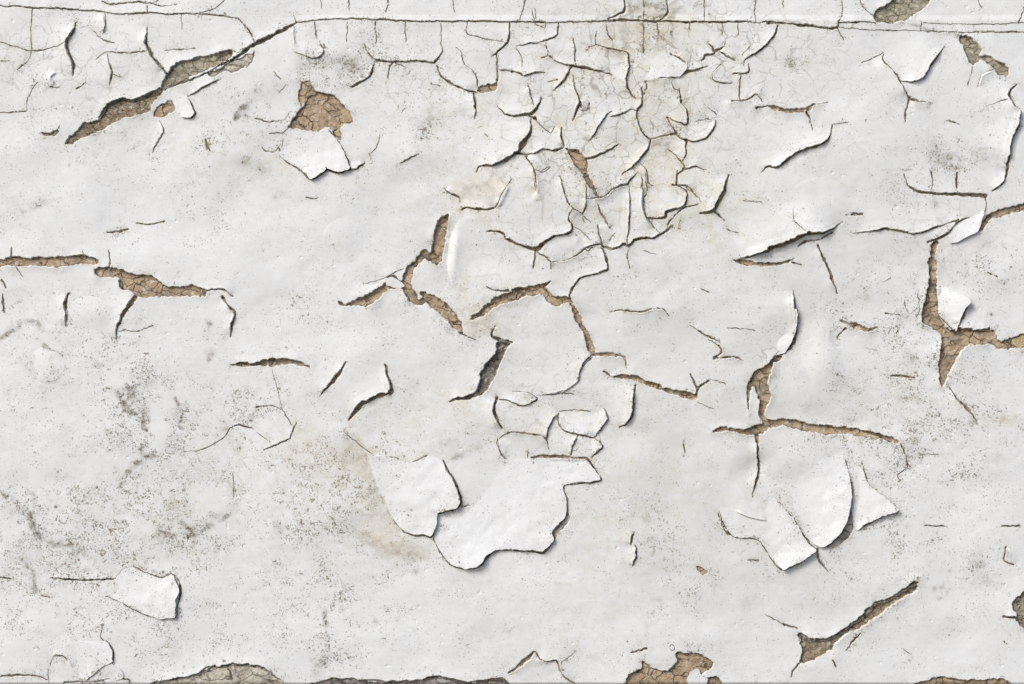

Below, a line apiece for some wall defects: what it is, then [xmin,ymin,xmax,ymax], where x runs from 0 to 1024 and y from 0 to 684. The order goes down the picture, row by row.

peeling [42,21,307,144]
peeling [279,81,353,181]
crack [293,0,1024,294]
peeling [0,247,236,339]
peeling [339,215,726,409]
peeling [922,203,1024,424]
peeling [450,326,512,428]
peeling [713,291,908,497]
peeling [719,451,899,571]
peeling [151,663,284,684]
peeling [624,648,722,684]
peeling [791,581,918,678]